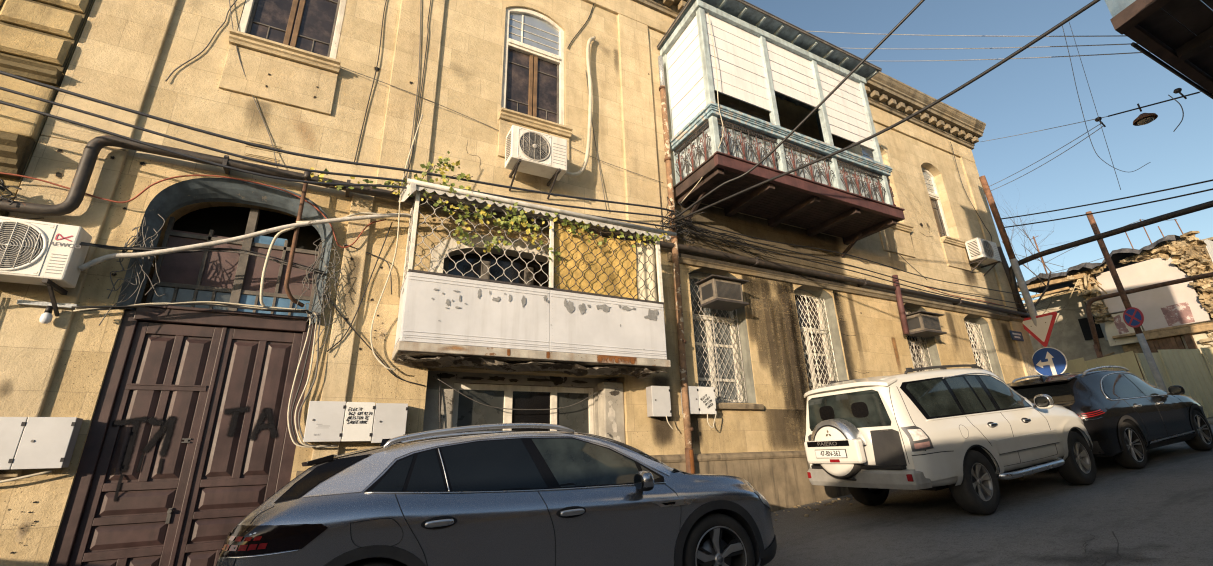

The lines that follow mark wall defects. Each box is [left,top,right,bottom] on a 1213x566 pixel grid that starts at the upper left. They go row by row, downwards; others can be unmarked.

peeling [431,288,526,321]
peeling [564,298,659,327]
damp [744,277,809,447]